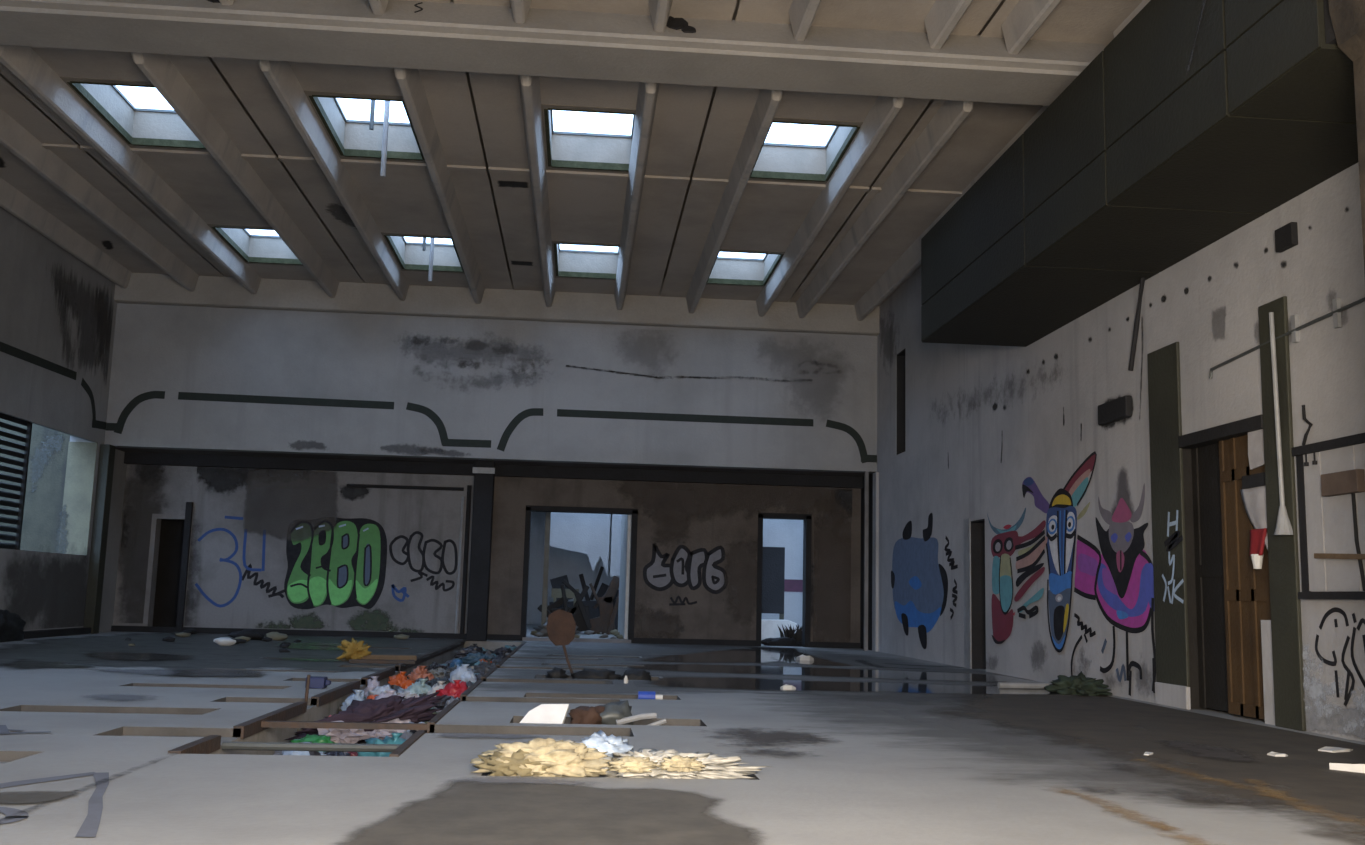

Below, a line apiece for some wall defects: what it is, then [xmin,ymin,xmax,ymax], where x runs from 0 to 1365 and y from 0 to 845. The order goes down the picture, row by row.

peeling [413,336,513,368]
crack [566,365,812,382]